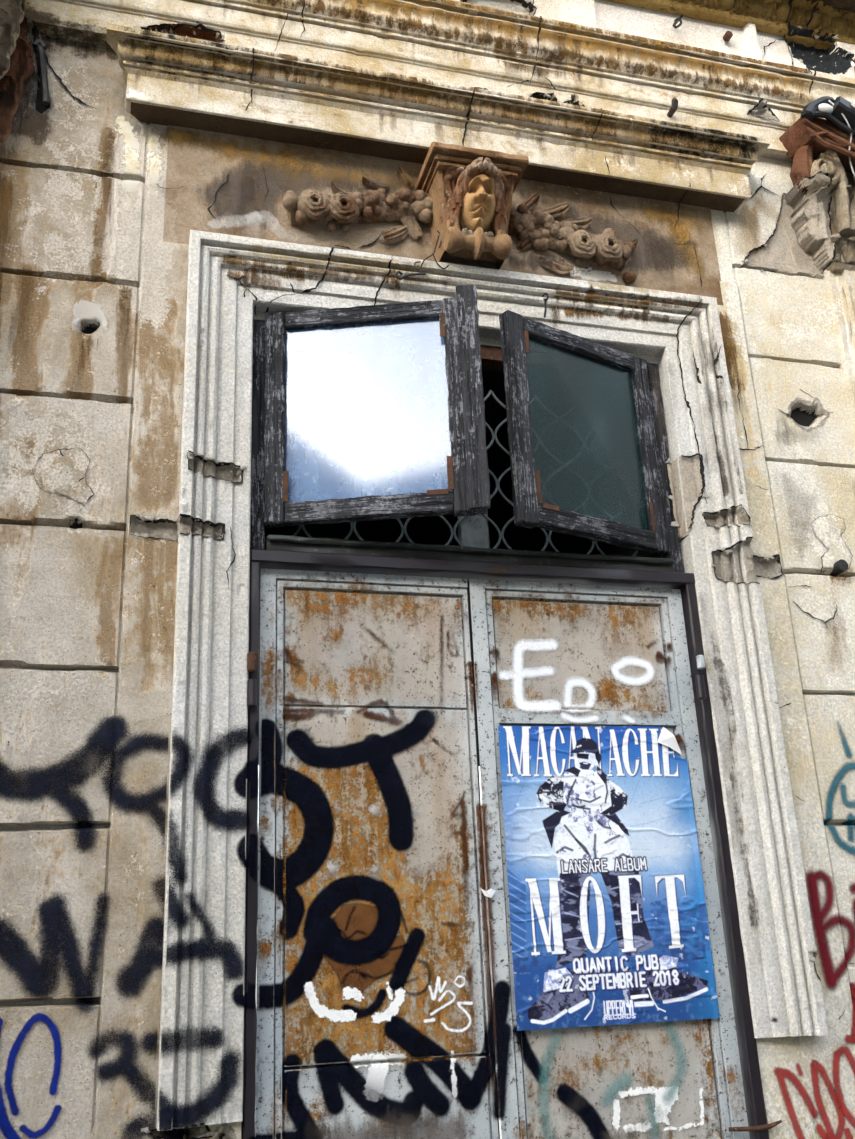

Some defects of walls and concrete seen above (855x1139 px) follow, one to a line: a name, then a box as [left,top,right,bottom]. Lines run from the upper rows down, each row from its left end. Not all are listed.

leakage [257,0,809,101]
crack [747,175,782,199]
leakage [119,287,132,333]
crack [673,184,765,504]
leakage [719,312,740,385]
peeling [665,453,784,584]
rust [257,645,400,724]
rust [281,579,478,711]
rust [491,648,502,691]
rust [595,672,663,714]
rust [647,642,672,667]
rust [258,759,496,1091]